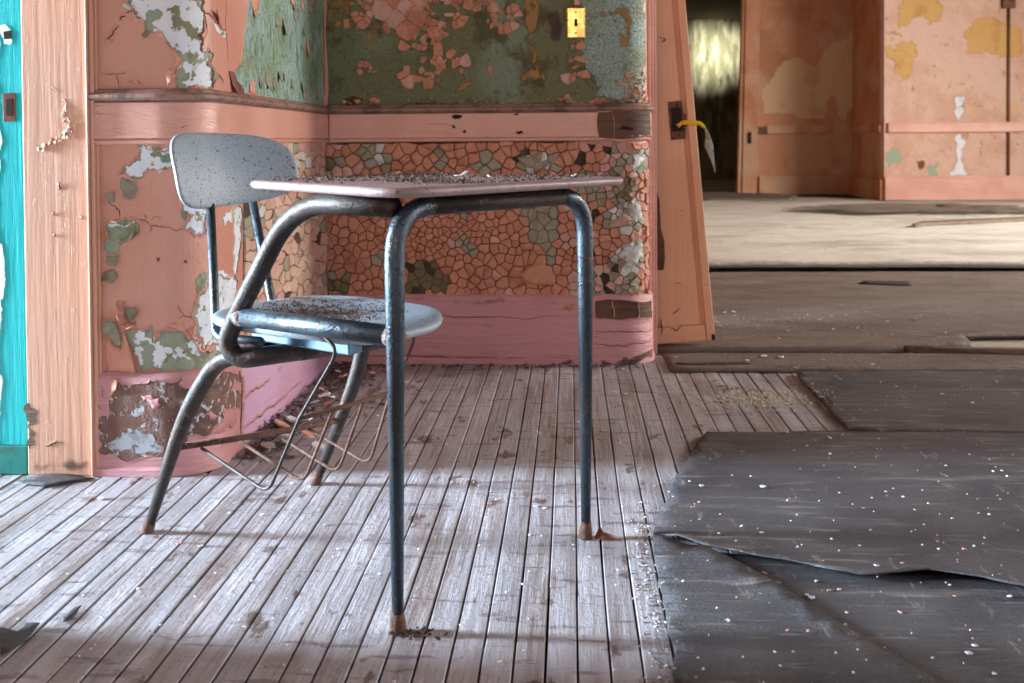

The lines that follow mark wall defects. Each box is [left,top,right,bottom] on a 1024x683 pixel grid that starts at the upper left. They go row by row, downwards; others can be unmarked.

peeling [0,24,12,45]
peeling [122,0,651,142]
peeling [761,30,852,121]
peeling [886,0,944,81]
peeling [963,16,1023,57]
peeling [106,144,173,203]
peeling [175,188,207,238]
peeling [97,204,243,464]